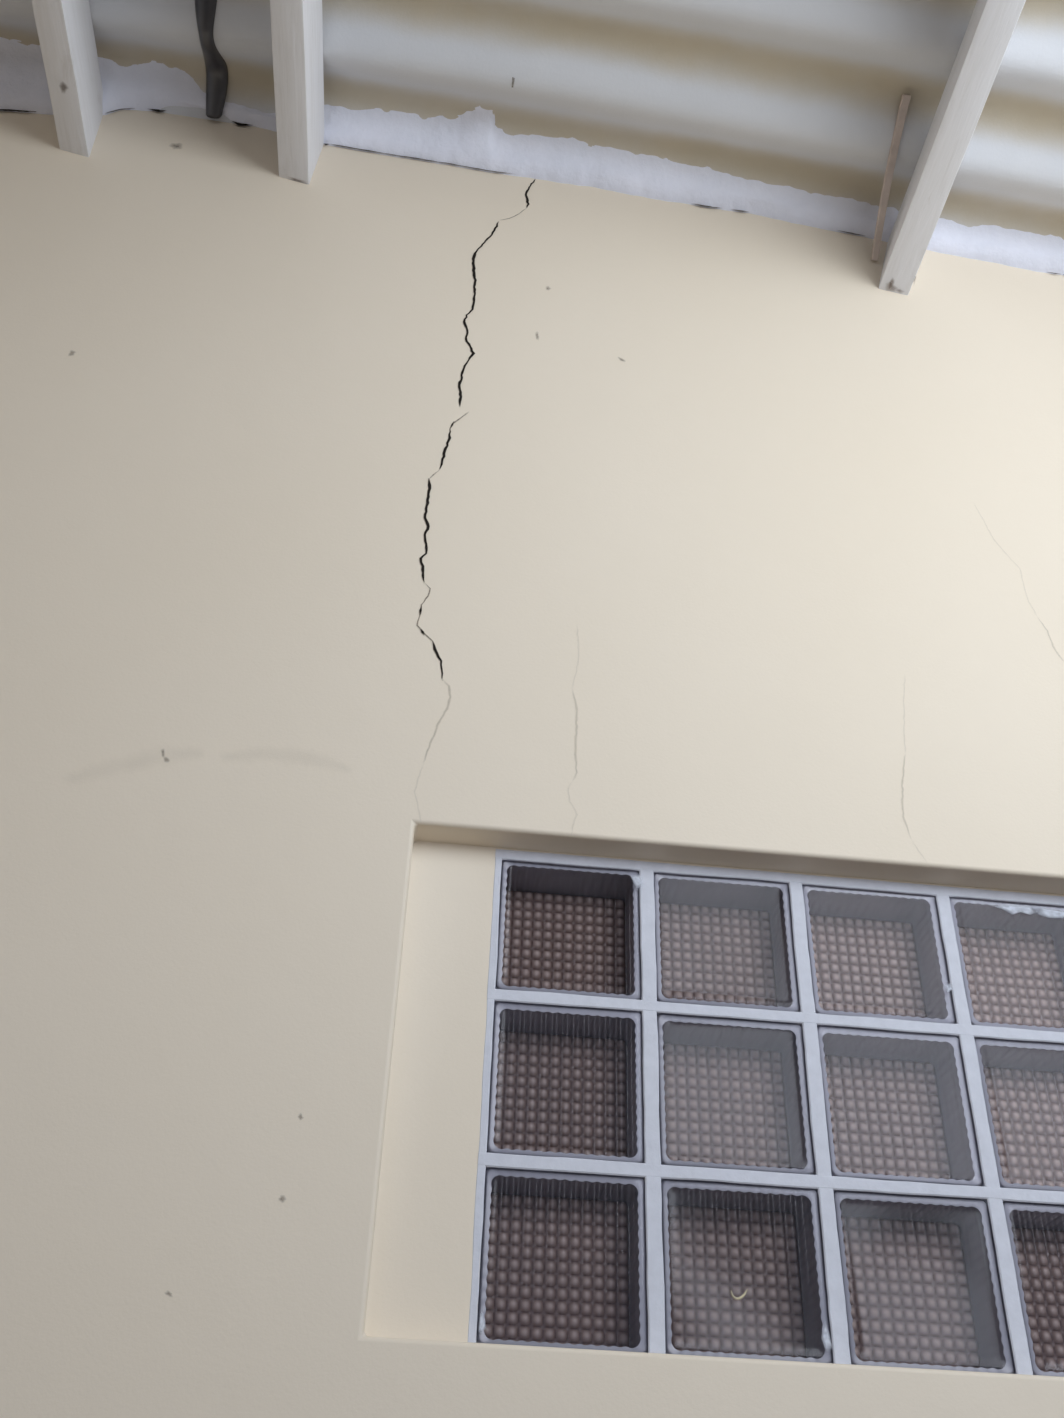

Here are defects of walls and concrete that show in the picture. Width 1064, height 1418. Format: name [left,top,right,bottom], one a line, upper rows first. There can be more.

crack [324,143,535,677]